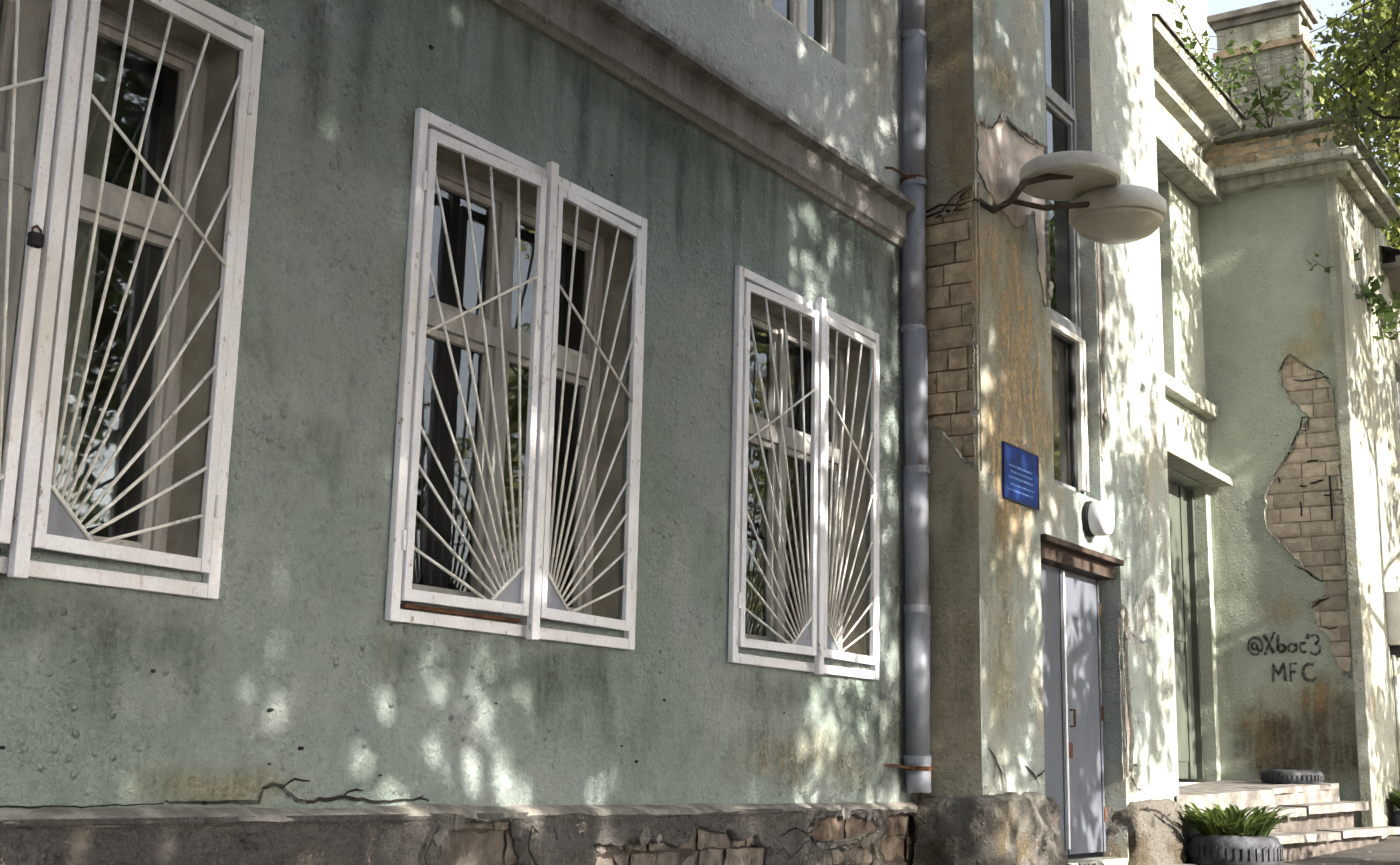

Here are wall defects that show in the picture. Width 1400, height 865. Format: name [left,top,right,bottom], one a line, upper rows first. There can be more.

spalling [925,112,1054,471]
spalling [1260,356,1352,679]
damp [1256,714,1358,774]
crack [0,778,440,865]
crack [776,816,883,865]